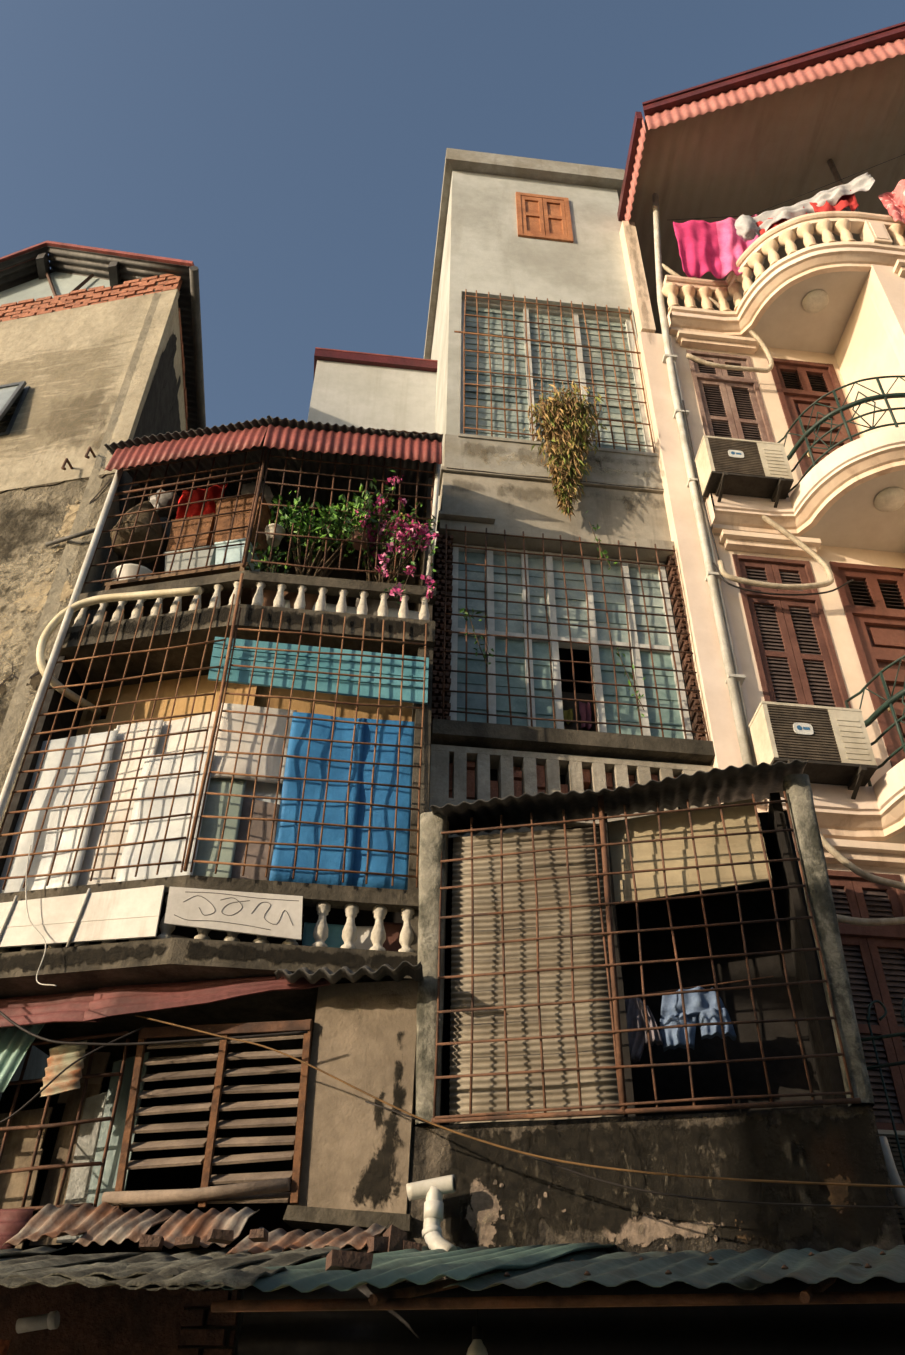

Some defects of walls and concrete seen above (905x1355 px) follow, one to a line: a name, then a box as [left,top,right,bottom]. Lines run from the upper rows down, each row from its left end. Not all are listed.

leakage [0,503,58,615]
leakage [350,1032,406,1208]
flaking render [466,1177,505,1248]
leakage [440,1111,892,1251]
flaking render [601,1212,768,1250]